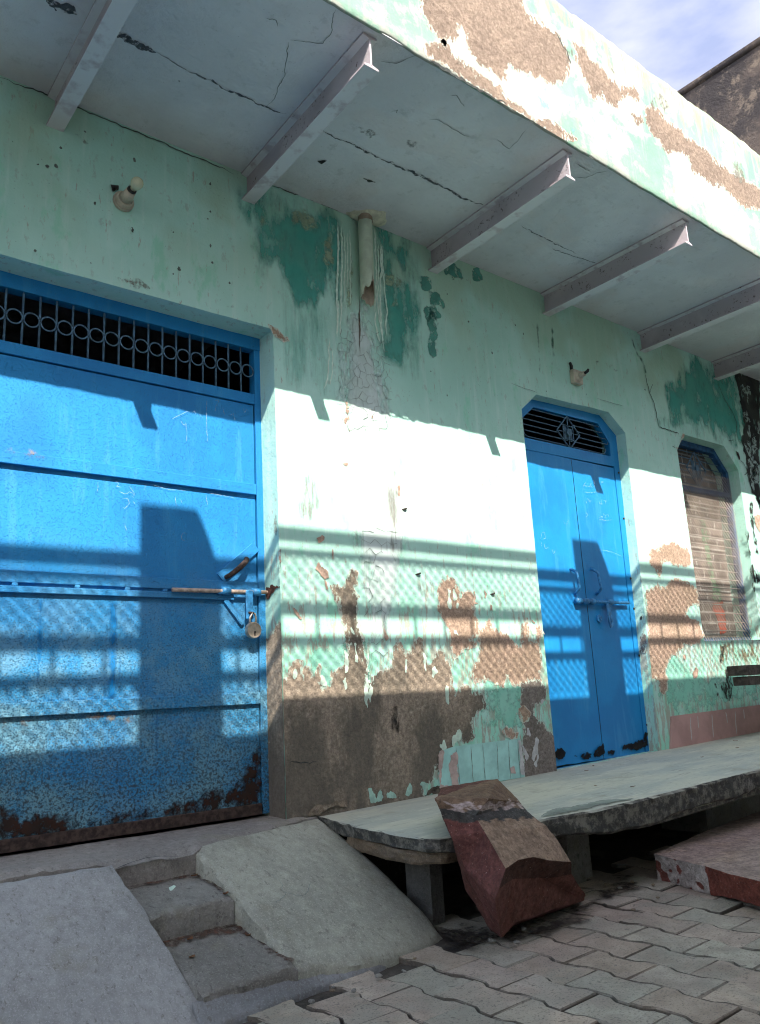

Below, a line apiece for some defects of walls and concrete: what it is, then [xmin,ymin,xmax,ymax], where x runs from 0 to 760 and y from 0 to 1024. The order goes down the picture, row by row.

crack [117,12,335,113]
crack [325,132,483,205]
peeling [418,0,760,211]
crack [337,296,393,433]
peeling [266,535,648,819]
peeling [639,541,705,695]
corrosion [0,805,149,840]
corrosion [164,748,262,816]